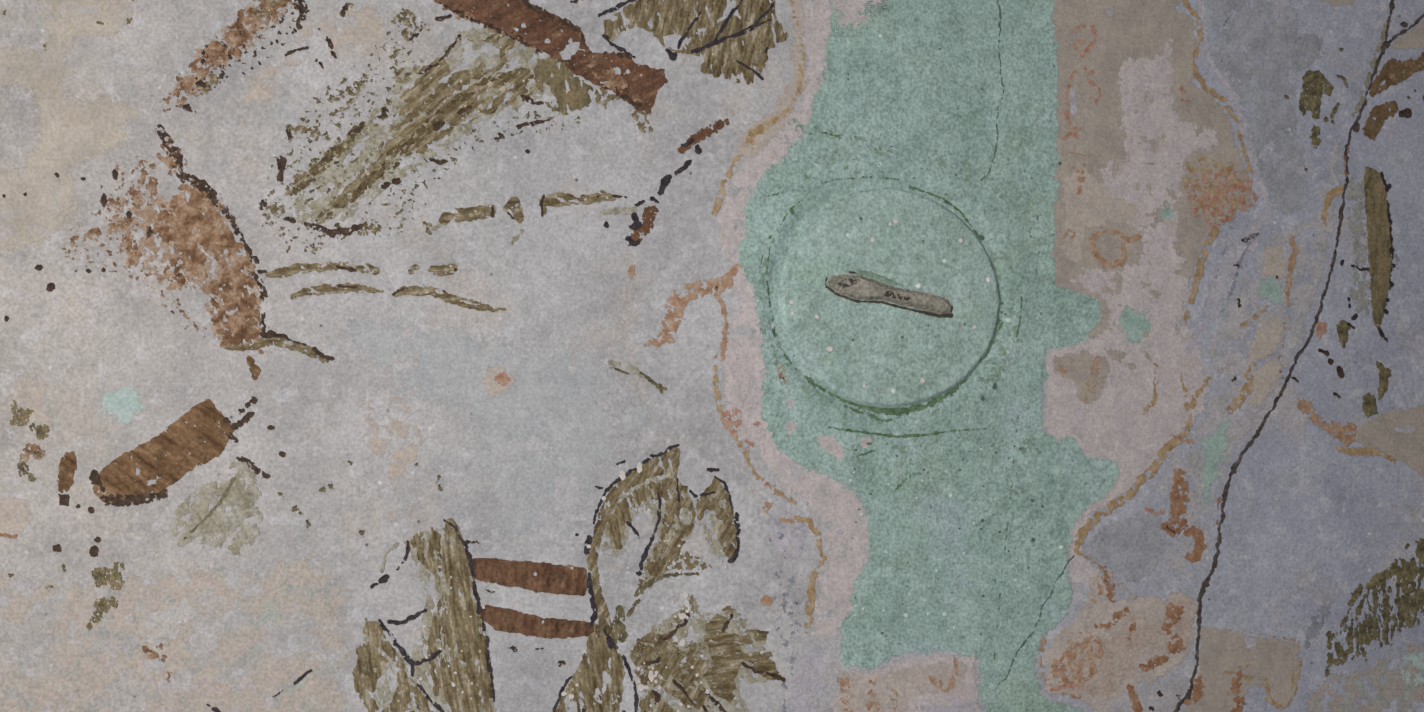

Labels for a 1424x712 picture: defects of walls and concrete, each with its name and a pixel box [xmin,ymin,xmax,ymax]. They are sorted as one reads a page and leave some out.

peeling [817,435,873,481]
flaking render [1039,0,1262,371]
crack [1173,0,1424,712]